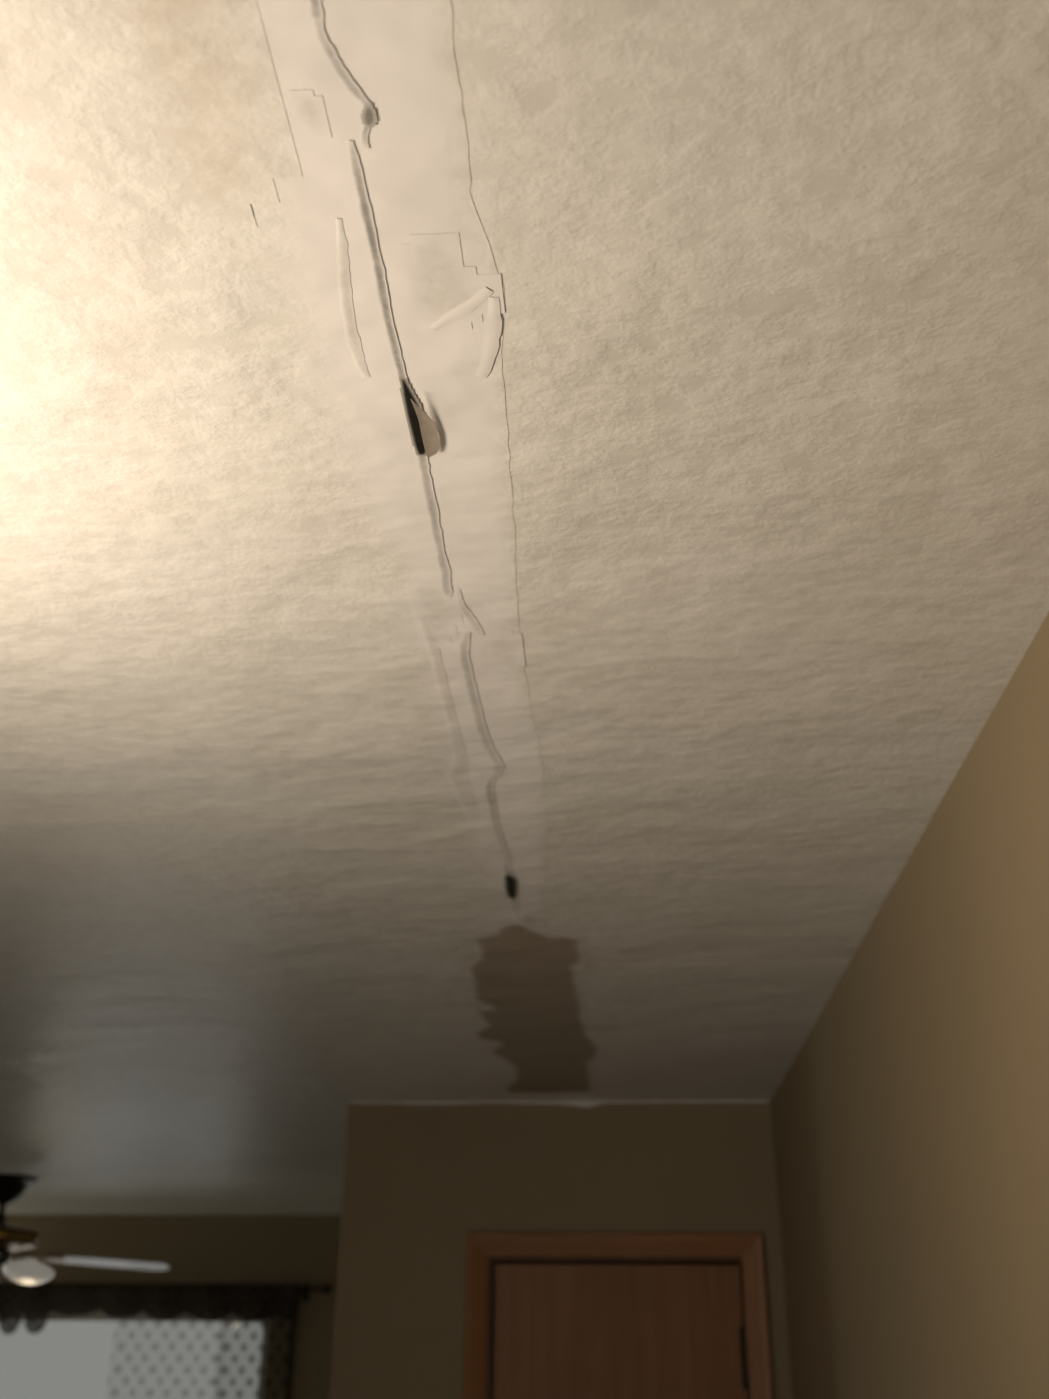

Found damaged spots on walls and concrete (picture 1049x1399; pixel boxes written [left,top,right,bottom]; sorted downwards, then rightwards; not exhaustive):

crack [308,0,407,383]
crack [416,455,513,876]
peeling [452,874,605,1094]